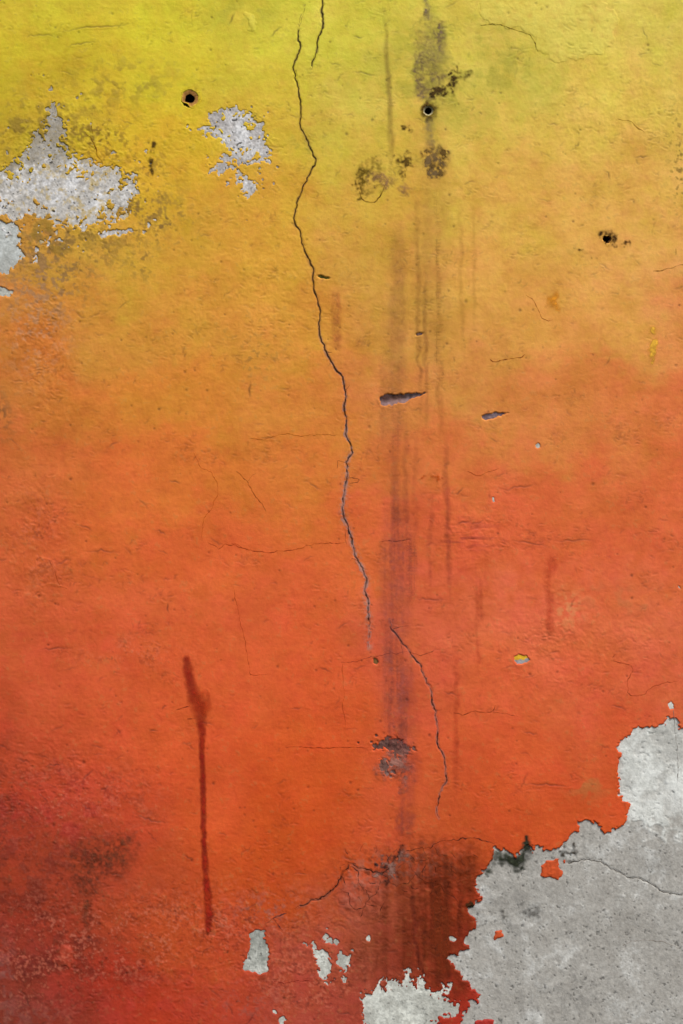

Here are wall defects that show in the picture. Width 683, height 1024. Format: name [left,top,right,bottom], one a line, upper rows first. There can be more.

leakage [413,23,470,120]
peeling [0,86,156,274]
peeling [186,105,279,199]
leakage [355,168,388,200]
leakage [396,147,450,178]
spalling [380,392,426,406]
crack [193,0,516,931]
rust [184,657,213,932]
peeling [357,702,683,1024]
crack [566,858,683,896]
peeling [243,930,269,975]
peeling [303,928,353,985]